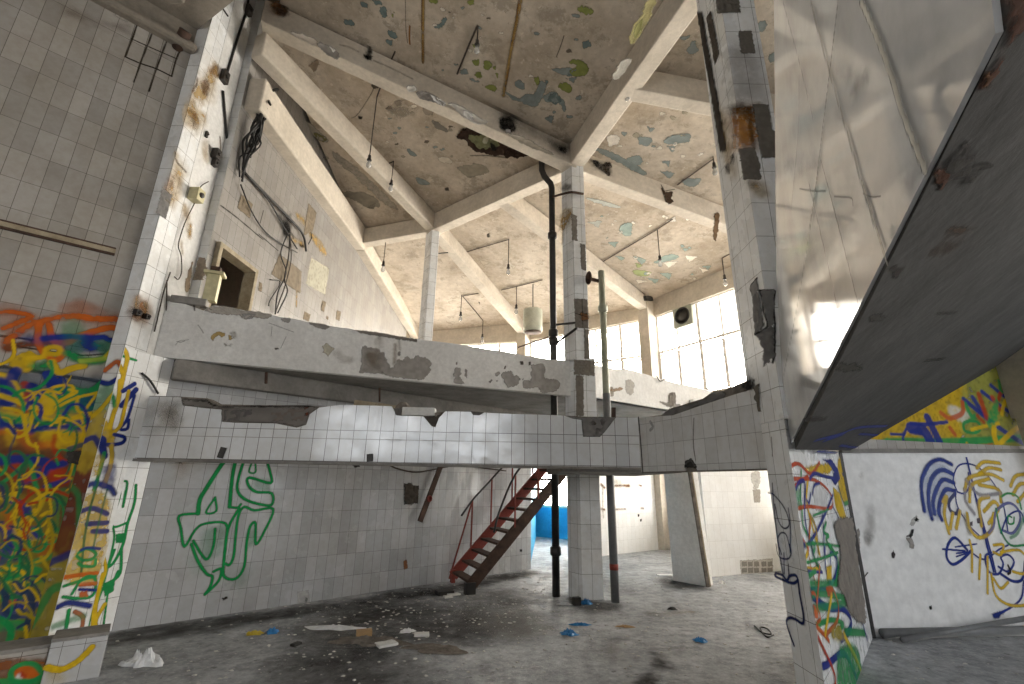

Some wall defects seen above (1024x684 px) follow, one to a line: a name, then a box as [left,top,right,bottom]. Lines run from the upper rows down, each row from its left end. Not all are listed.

rust [186,65,218,125]
spalling [385,85,553,178]
peeling [429,0,594,123]
peeling [596,126,703,222]
rust [722,105,759,173]
peeling [739,20,767,54]
peeling [739,104,775,180]
peeling [571,198,711,283]
flaking render [356,330,432,380]
flaking render [489,361,560,393]
spalling [567,299,615,437]
spalling [750,277,776,367]